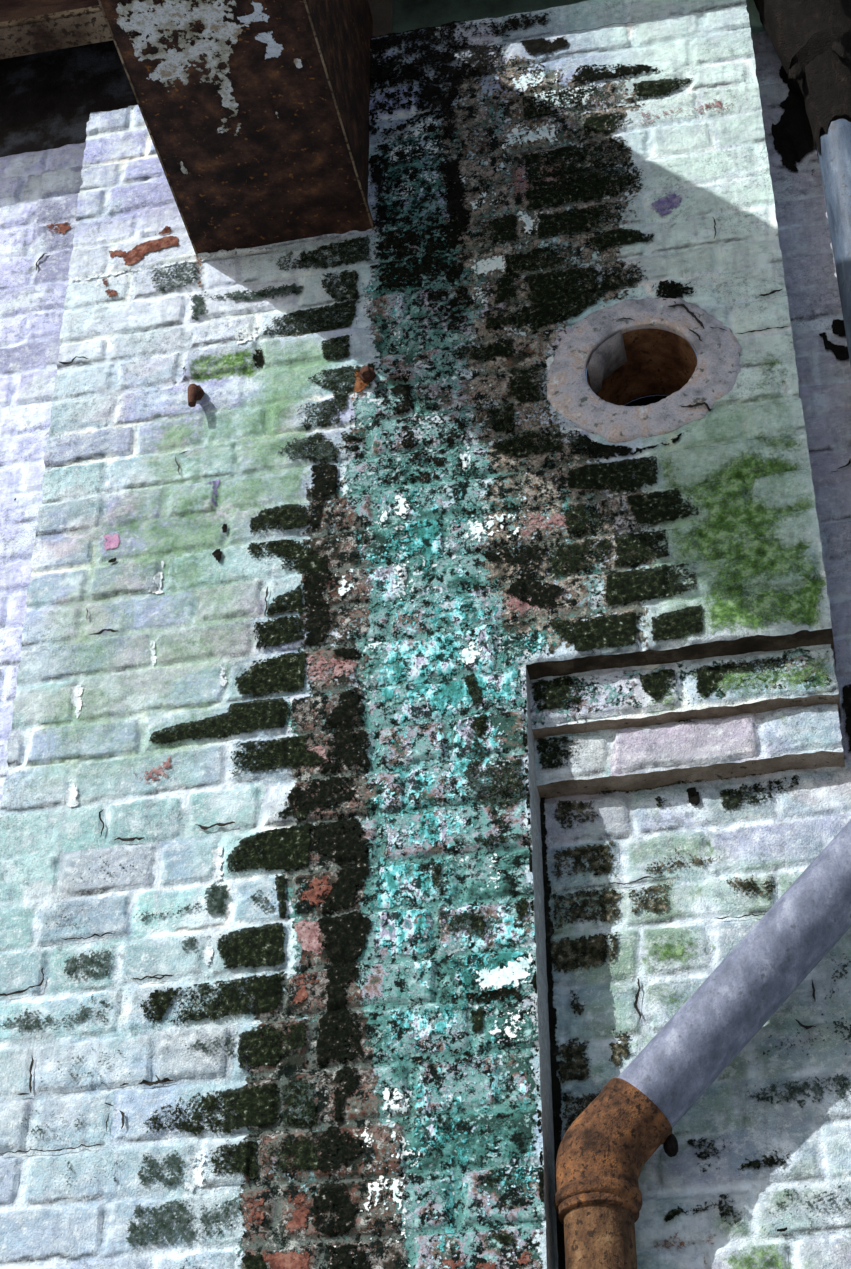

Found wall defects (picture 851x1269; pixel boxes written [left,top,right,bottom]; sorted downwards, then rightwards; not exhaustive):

peeling [502,587,541,619]
leakage [124,11,720,1269]
peeling [307,655,357,682]
leakage [529,647,831,728]
leakage [720,768,800,813]
leakage [726,875,777,900]
leakage [62,948,112,982]
leakage [21,1108,97,1149]
leakage [687,1138,731,1172]
leakage [738,1150,789,1176]
leakage [664,1194,741,1225]
peeling [437,1251,535,1269]